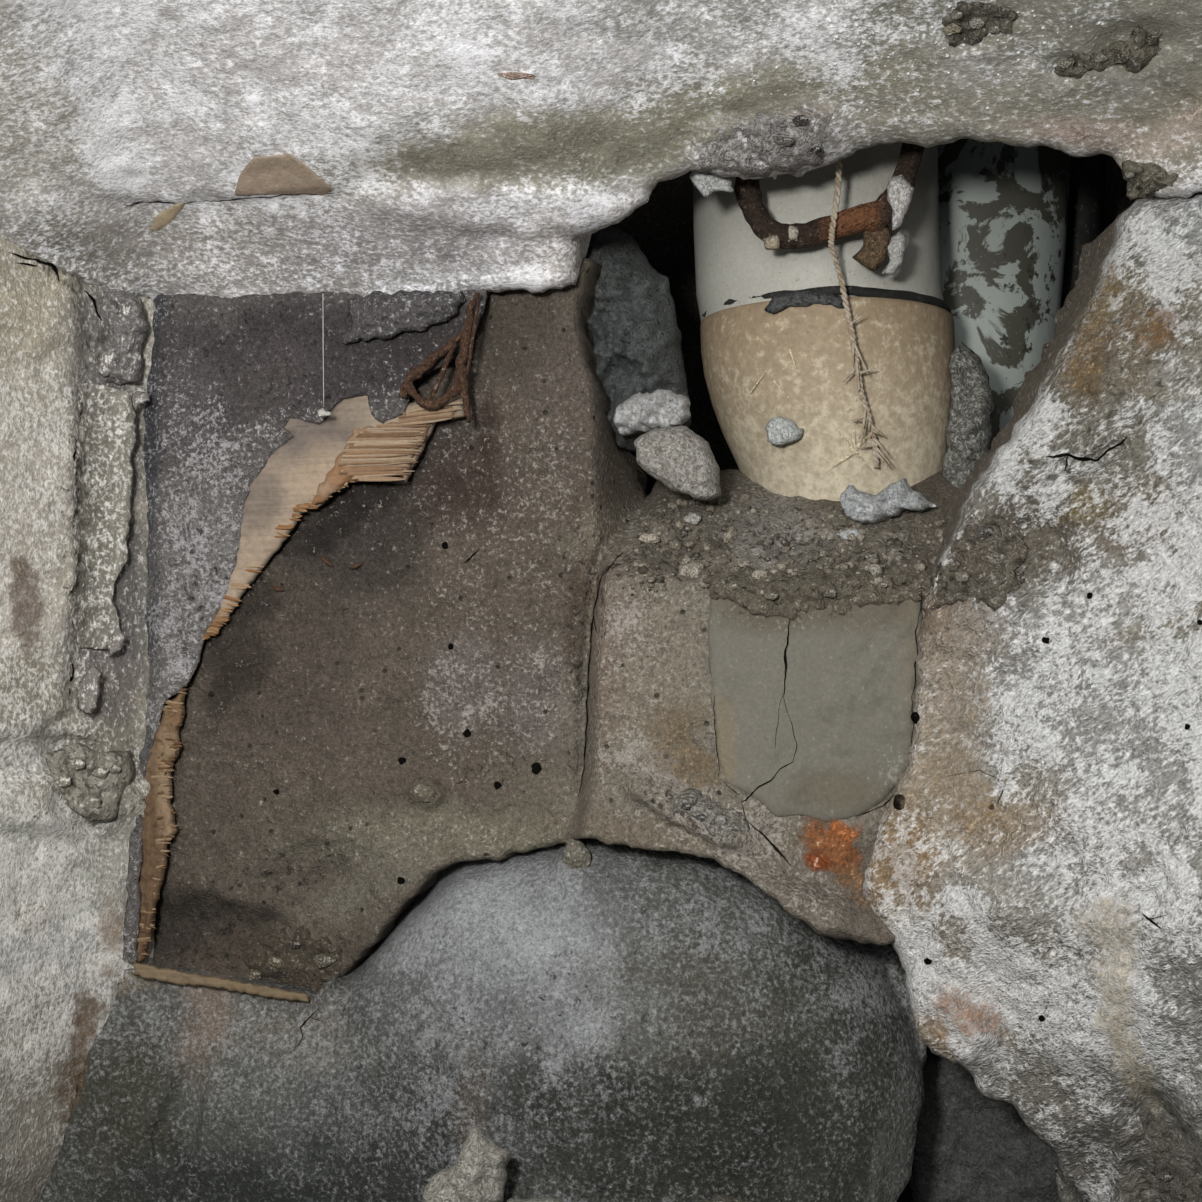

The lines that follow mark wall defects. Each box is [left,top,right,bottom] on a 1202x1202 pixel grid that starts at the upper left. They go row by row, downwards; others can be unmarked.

spalling [698,112,825,179]
corrosion [734,142,925,275]
peeling [341,290,465,344]
crack [578,553,623,796]
crack [713,621,797,867]
corrosion [804,818,864,901]
spalling [241,925,348,991]